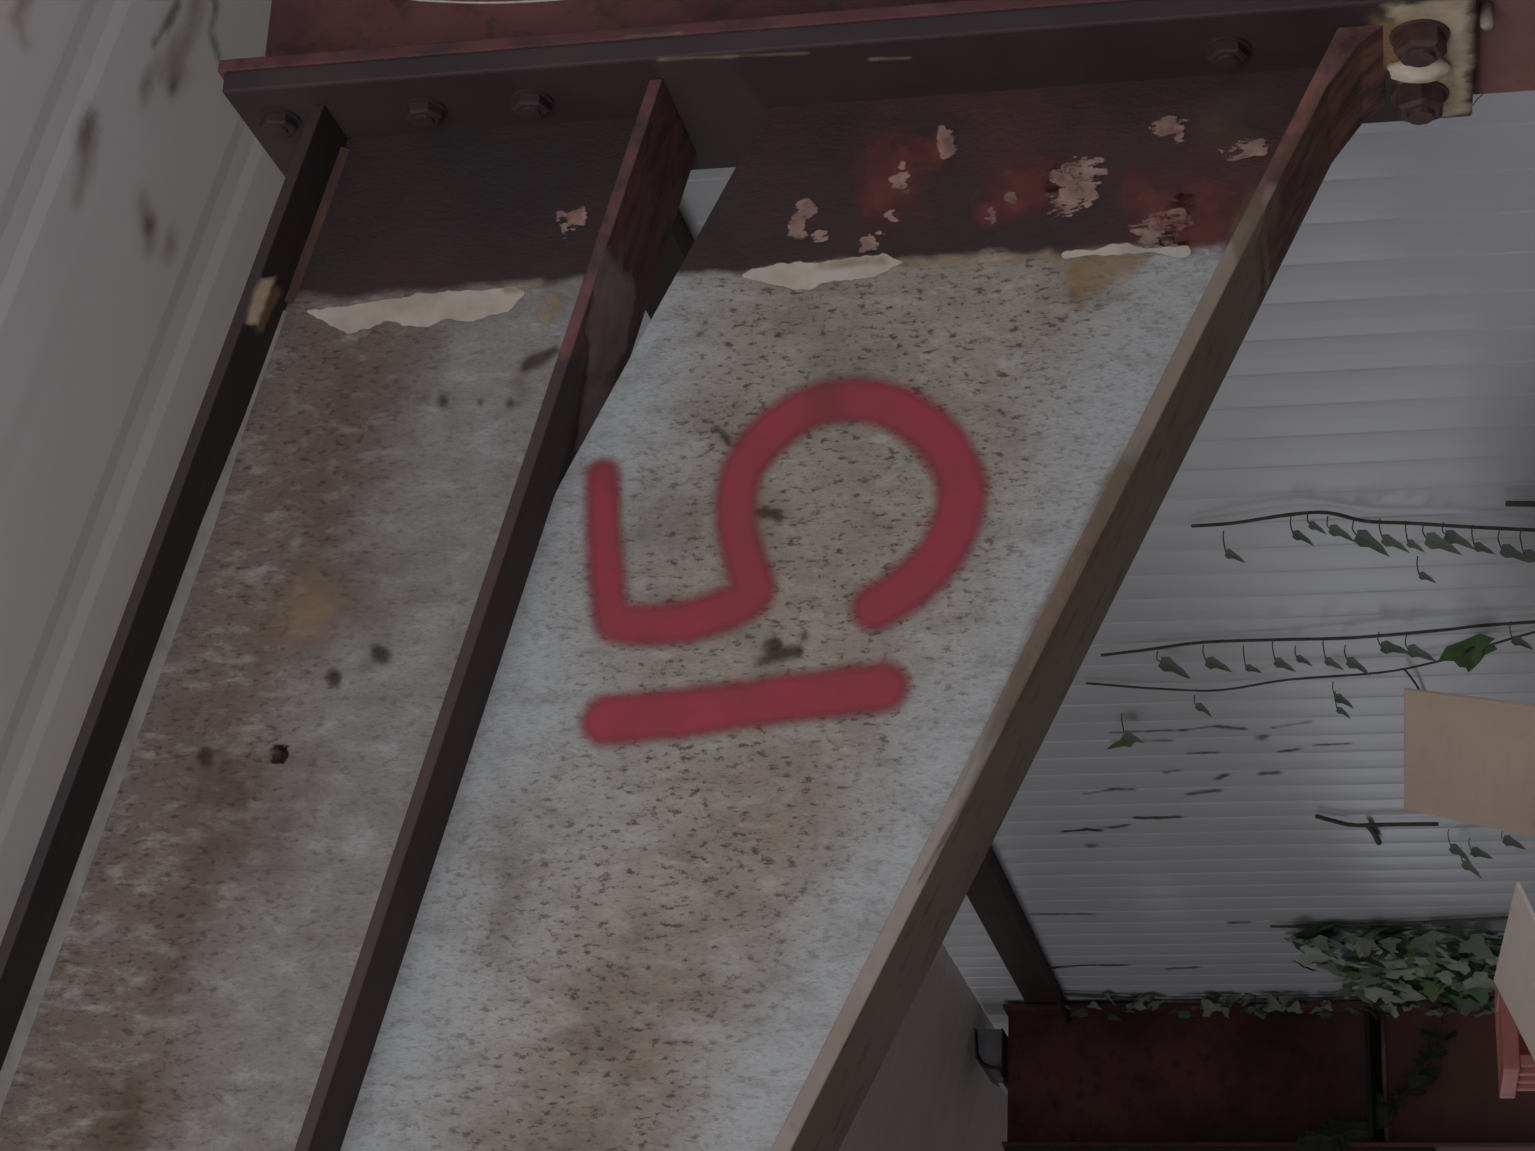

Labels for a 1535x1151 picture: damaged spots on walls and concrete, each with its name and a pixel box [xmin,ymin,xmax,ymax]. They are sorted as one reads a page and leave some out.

peeling [740,124,1019,290]
peeling [1047,156,1108,217]
peeling [307,283,540,334]